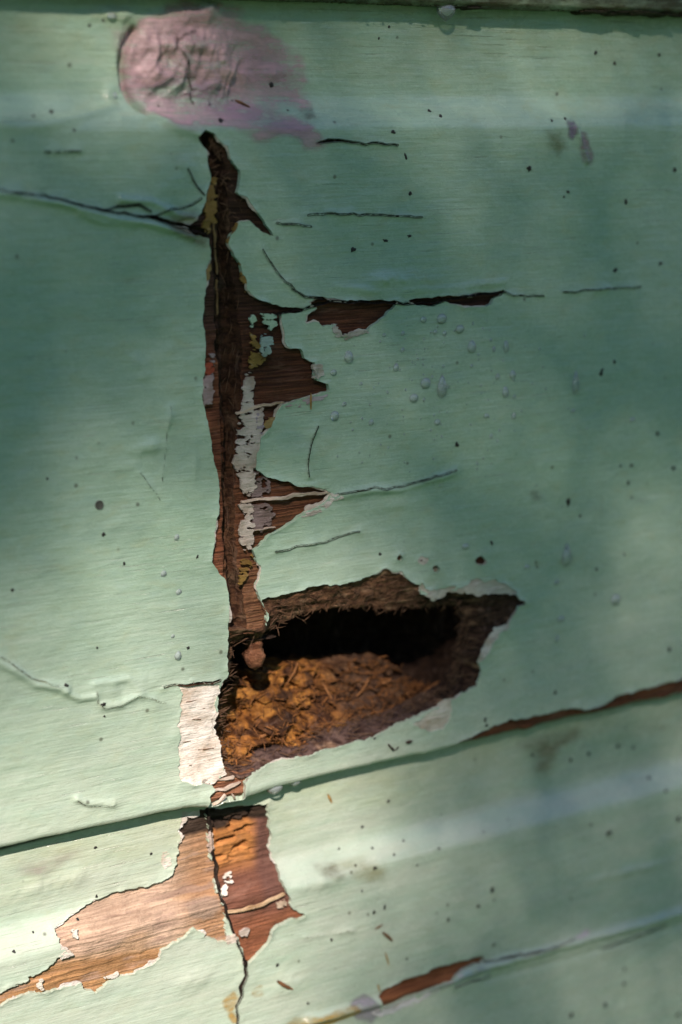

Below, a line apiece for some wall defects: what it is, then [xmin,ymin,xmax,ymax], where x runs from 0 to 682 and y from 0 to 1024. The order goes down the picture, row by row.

crack [0,168,208,234]
peeling [170,131,502,635]
peeling [418,578,517,601]
peeling [477,624,509,663]
peeling [413,698,452,732]
peeling [460,680,682,742]
peeling [0,682,303,1004]
crack [206,807,248,1024]
peeling [372,956,492,1017]